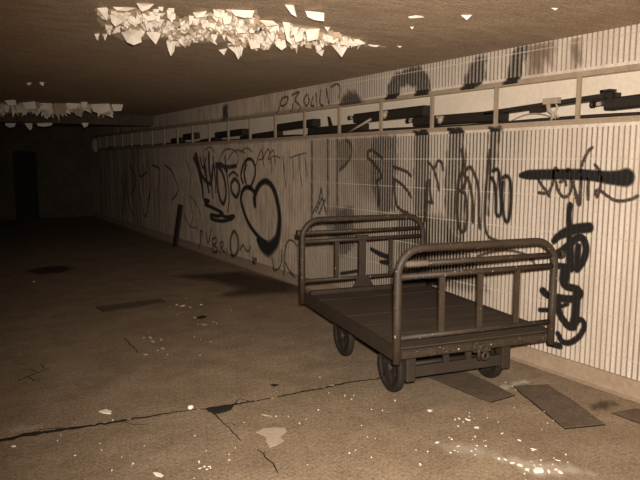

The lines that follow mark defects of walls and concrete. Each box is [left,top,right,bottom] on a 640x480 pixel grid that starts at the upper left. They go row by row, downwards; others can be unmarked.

peeling [94,3,387,60]
peeling [0,100,124,130]
crack [0,377,381,442]